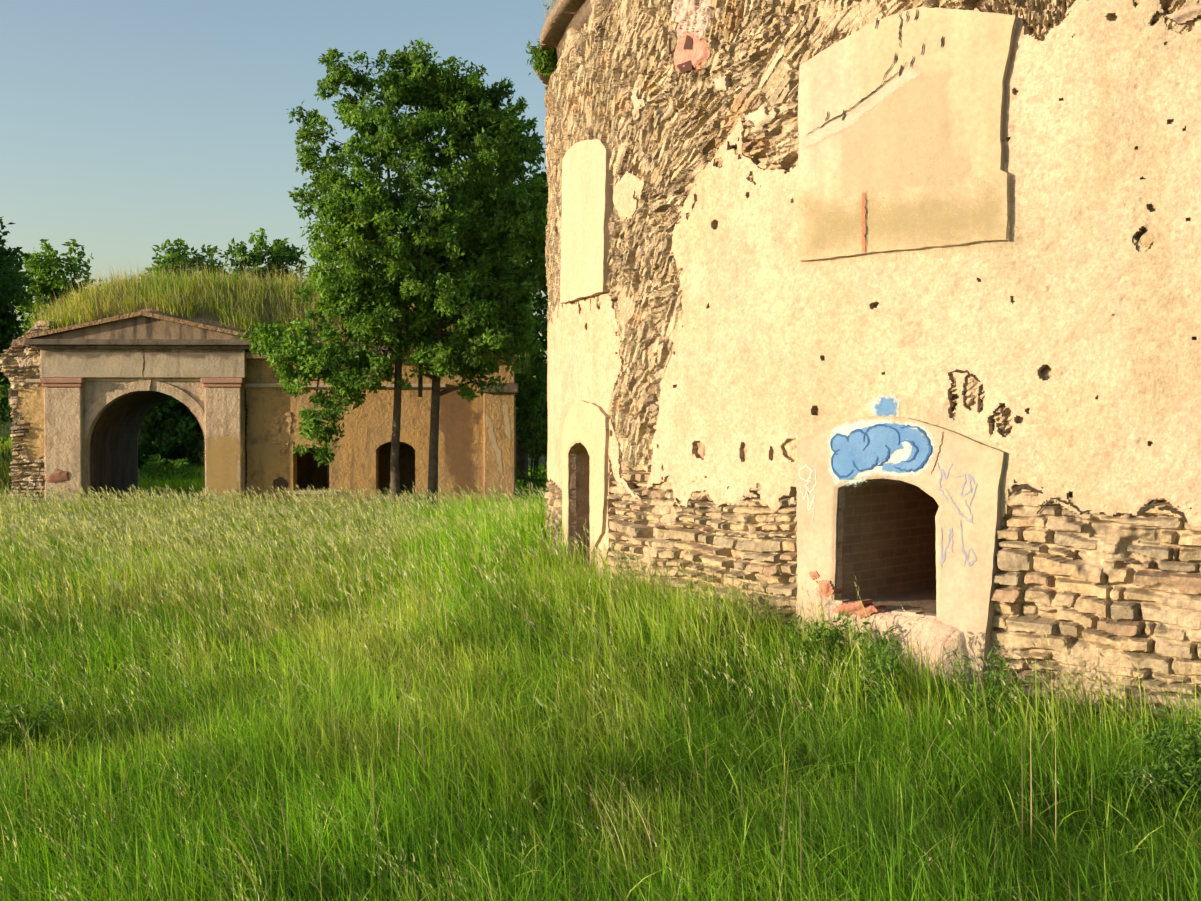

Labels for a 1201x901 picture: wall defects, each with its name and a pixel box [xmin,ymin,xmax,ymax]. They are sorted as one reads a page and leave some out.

spalling [1151,0,1201,45]
spalling [544,0,1079,632]
spalling [1132,227,1153,252]
spalling [988,484,1201,731]